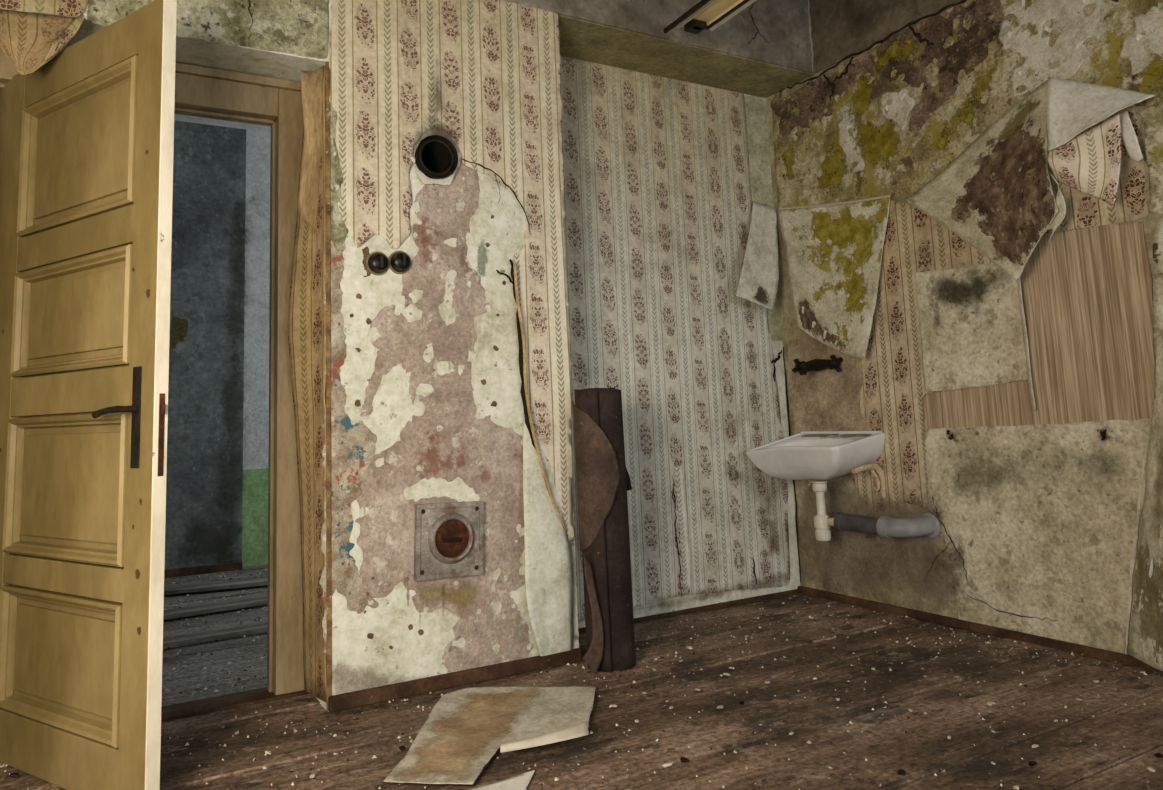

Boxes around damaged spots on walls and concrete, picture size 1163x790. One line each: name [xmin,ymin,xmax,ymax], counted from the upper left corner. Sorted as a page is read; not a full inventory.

peeling [744,0,1163,209]
peeling [319,105,533,673]
water stain [1134,453,1163,666]